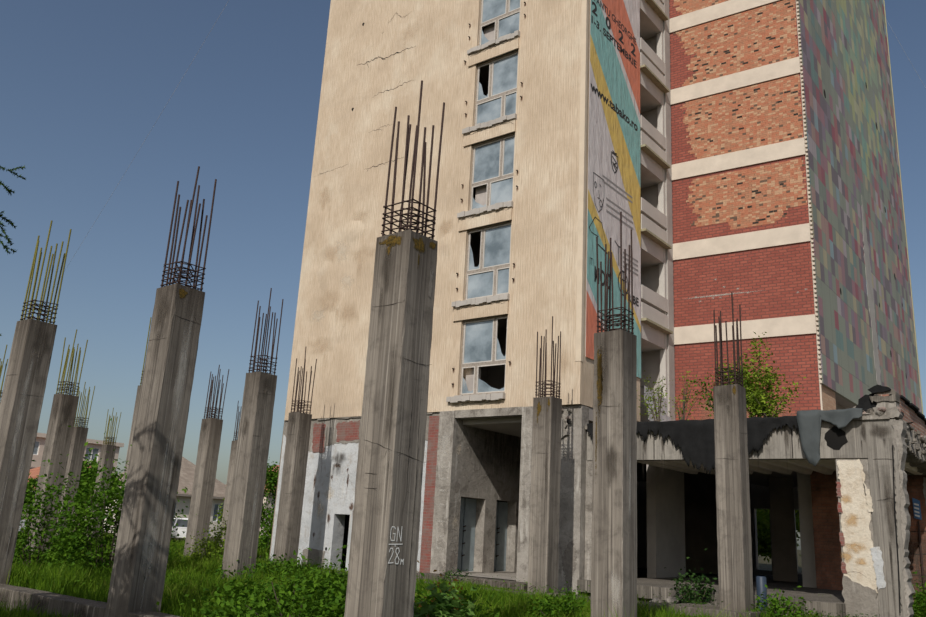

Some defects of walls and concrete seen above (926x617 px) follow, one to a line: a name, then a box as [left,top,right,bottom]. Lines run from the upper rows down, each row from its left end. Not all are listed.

spalling [673,0,798,86]
spalling [680,74,803,160]
spalling [899,419,926,505]
peeling [836,459,886,617]